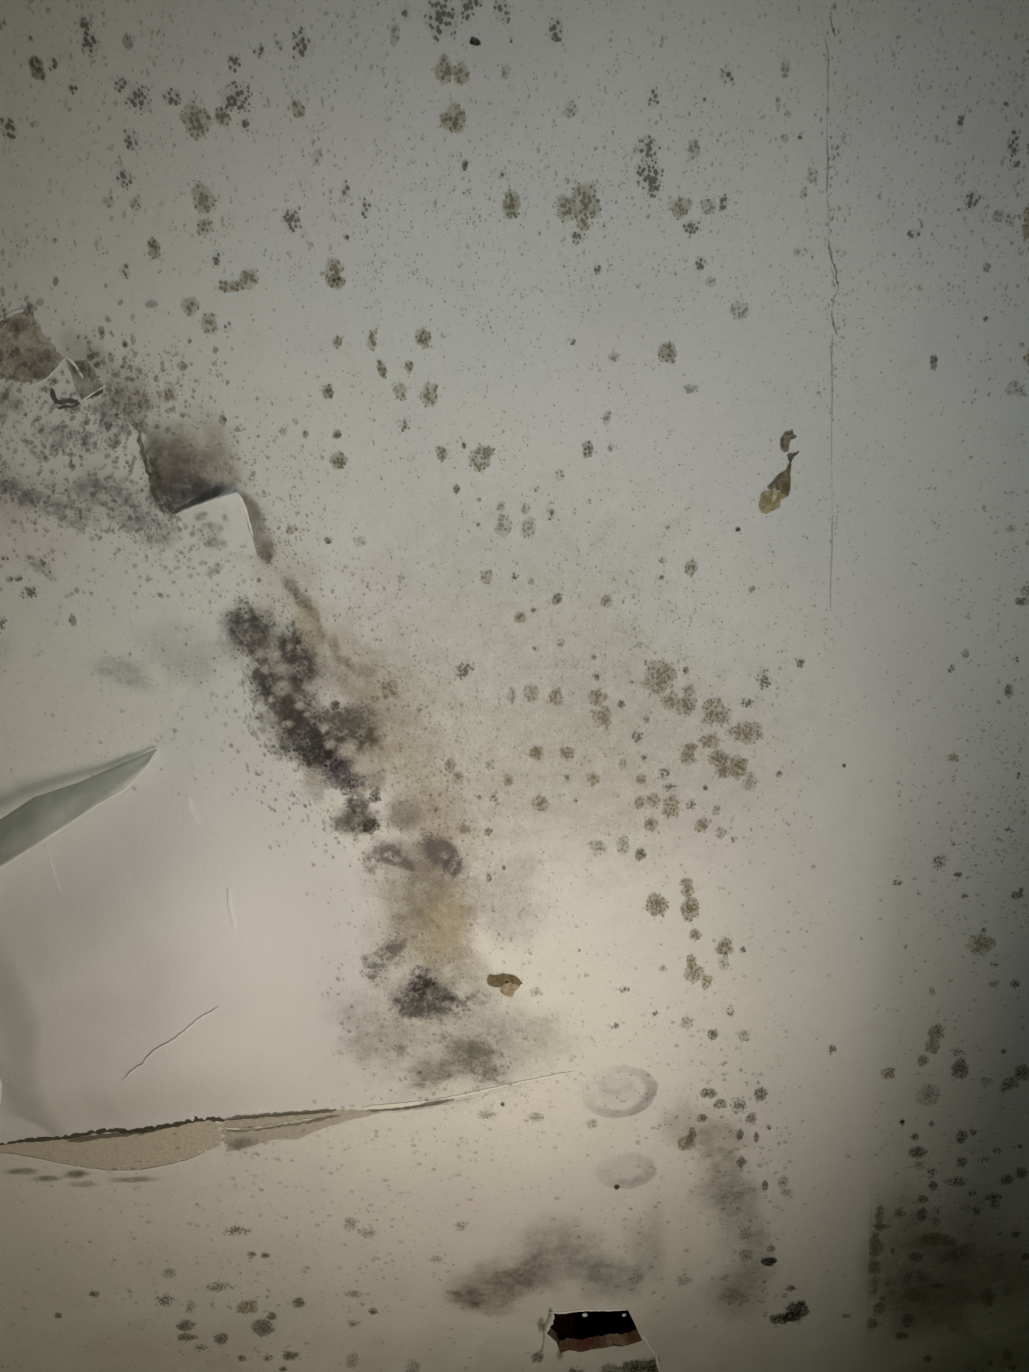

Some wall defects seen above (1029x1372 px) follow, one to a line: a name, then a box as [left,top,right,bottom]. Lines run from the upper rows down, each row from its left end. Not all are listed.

water stain [1007,130,1029,168]
peeling [0,309,107,410]
peeling [136,422,271,561]
peeling [0,749,157,869]
water stain [226,597,493,1021]
water stain [868,1119,1027,1339]
spalling [541,1308,637,1353]